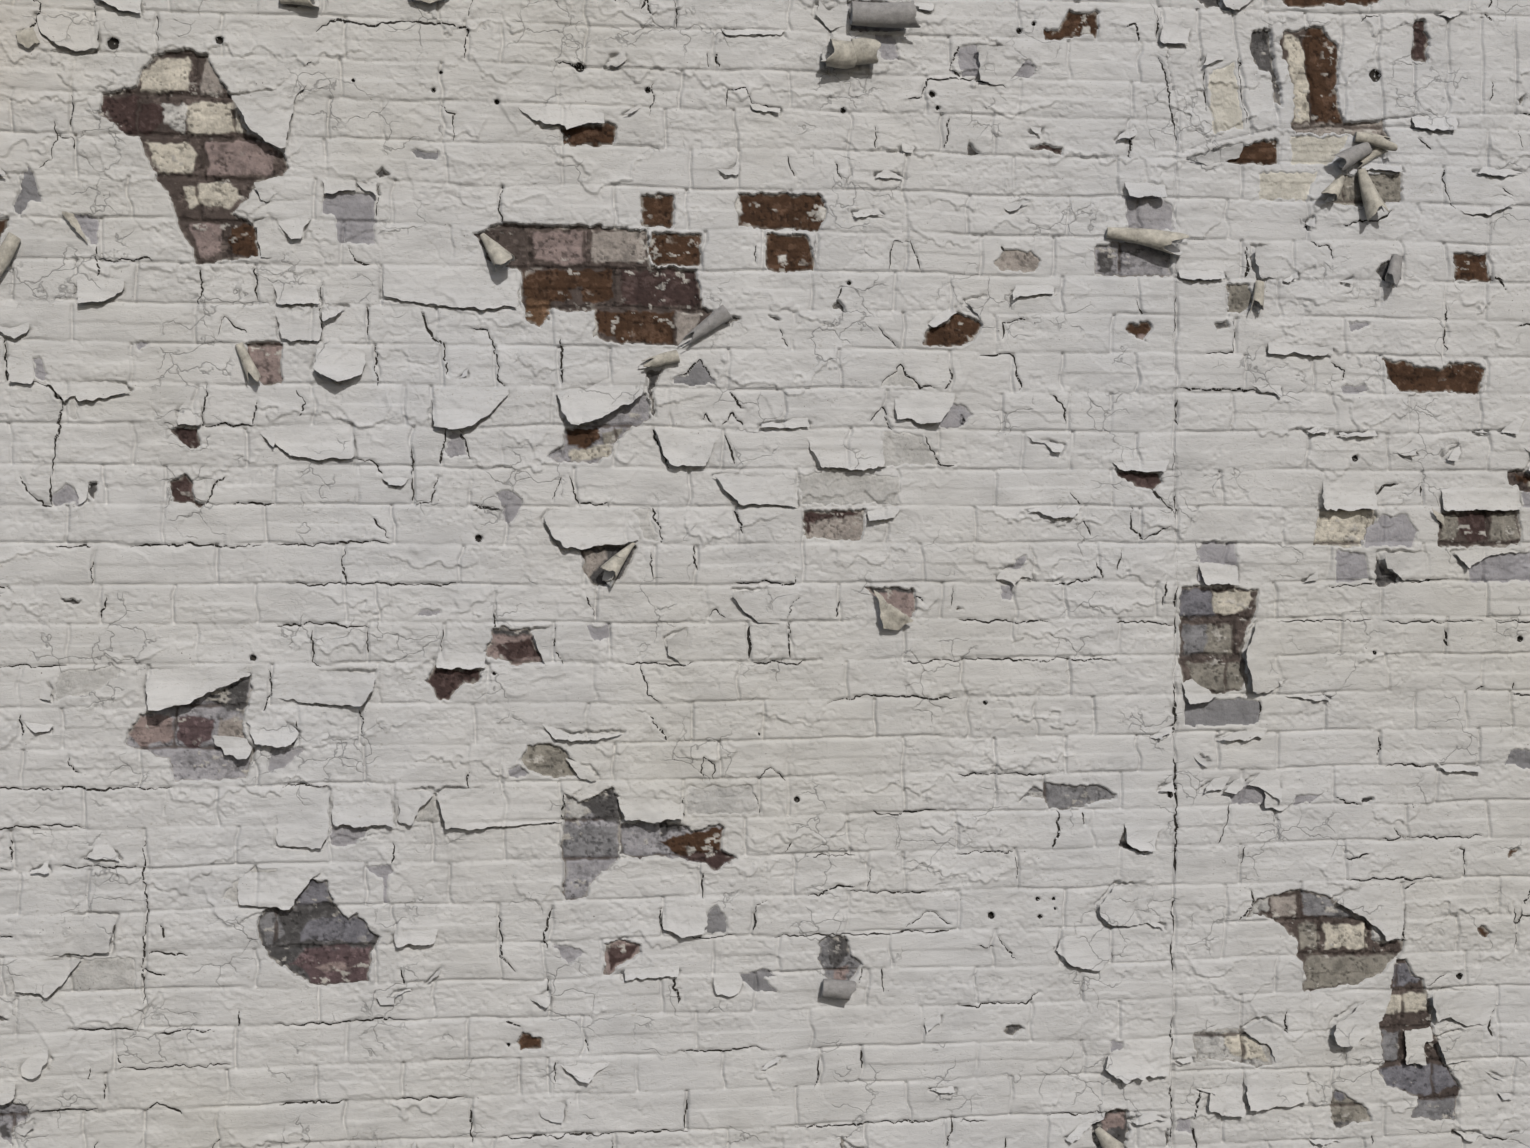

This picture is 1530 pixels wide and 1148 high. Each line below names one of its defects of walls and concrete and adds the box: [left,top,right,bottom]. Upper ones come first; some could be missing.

peeling [99,37,313,265]
peeling [735,193,827,273]
peeling [1190,27,1403,227]
peeling [383,193,739,464]
peeling [1382,358,1485,395]
peeling [1307,418,1530,587]
peeling [126,654,304,782]
peeling [426,626,556,700]
peeling [1150,541,1330,739]
peeling [508,723,760,900]
peeling [223,866,379,986]
peeling [1247,882,1513,1146]